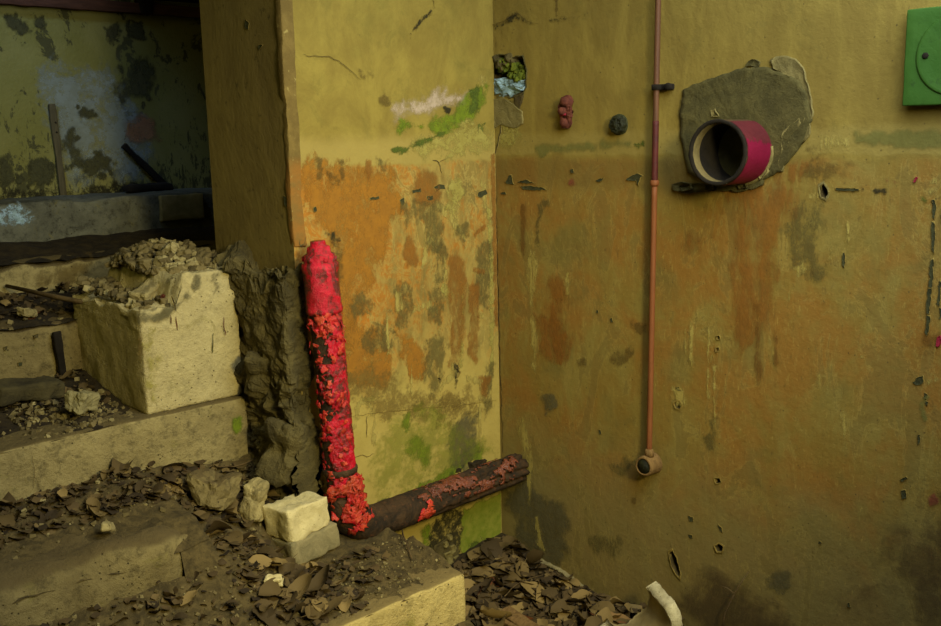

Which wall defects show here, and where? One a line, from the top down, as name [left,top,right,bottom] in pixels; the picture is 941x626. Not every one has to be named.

leakage [393,93,461,113]
spalling [492,53,528,147]
leakage [68,181,137,195]